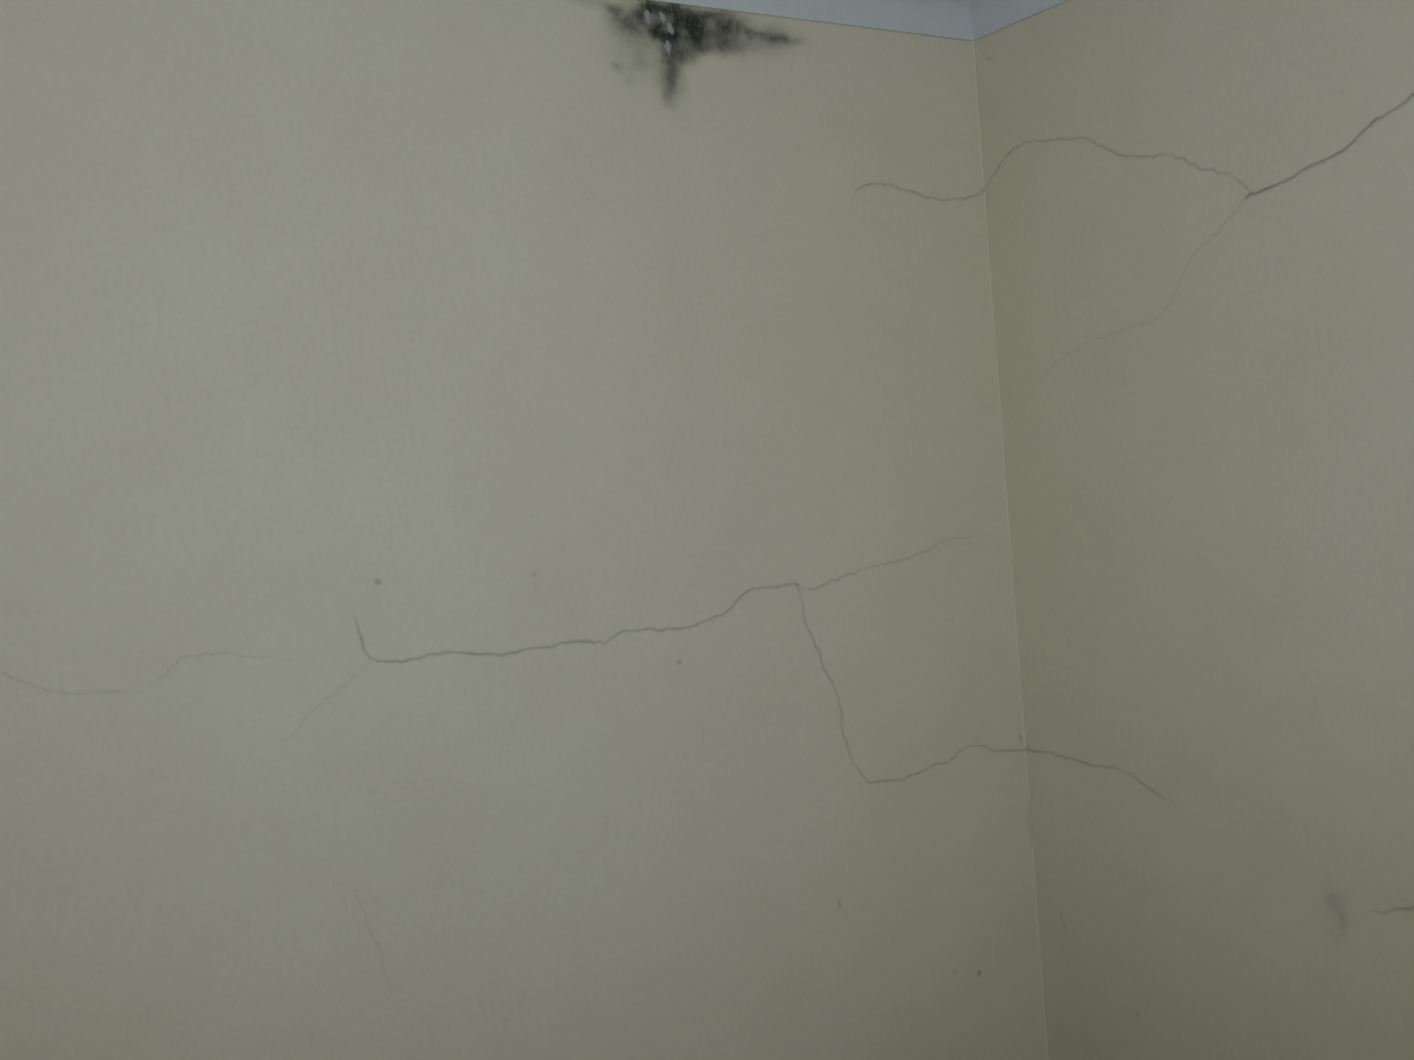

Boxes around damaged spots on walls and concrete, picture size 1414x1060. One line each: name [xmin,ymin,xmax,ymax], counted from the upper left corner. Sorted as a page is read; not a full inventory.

leakage [636,1,730,56]